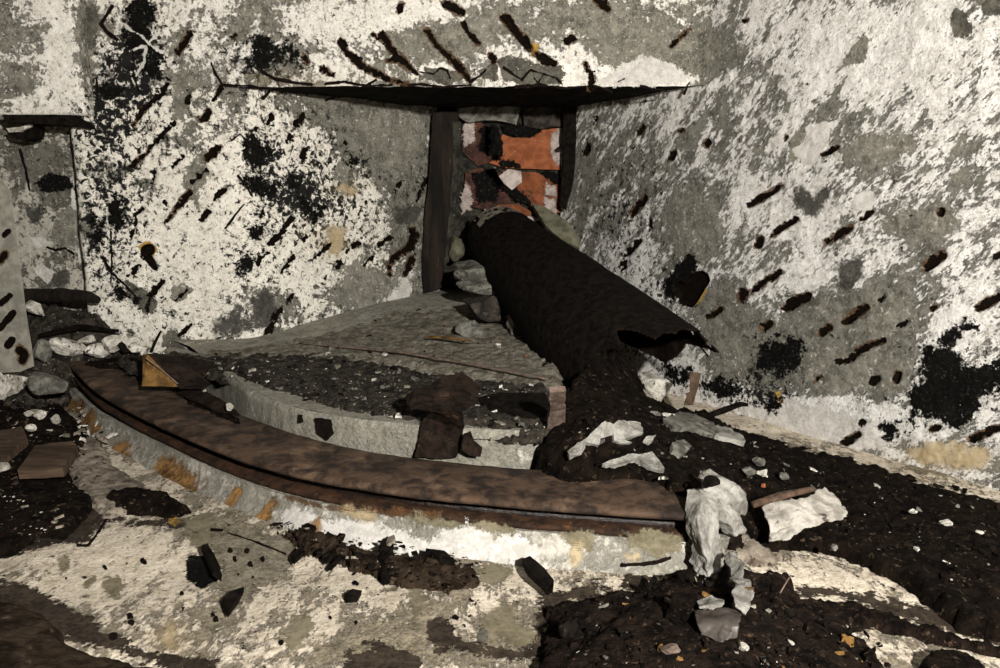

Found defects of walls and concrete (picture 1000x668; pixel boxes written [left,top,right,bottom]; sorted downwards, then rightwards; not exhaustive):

crack [93,77,101,101]
crack [99,4,141,93]
spalling [285,112,306,144]
leakage [239,122,336,225]
spalling [499,169,522,190]
peeling [660,190,729,308]